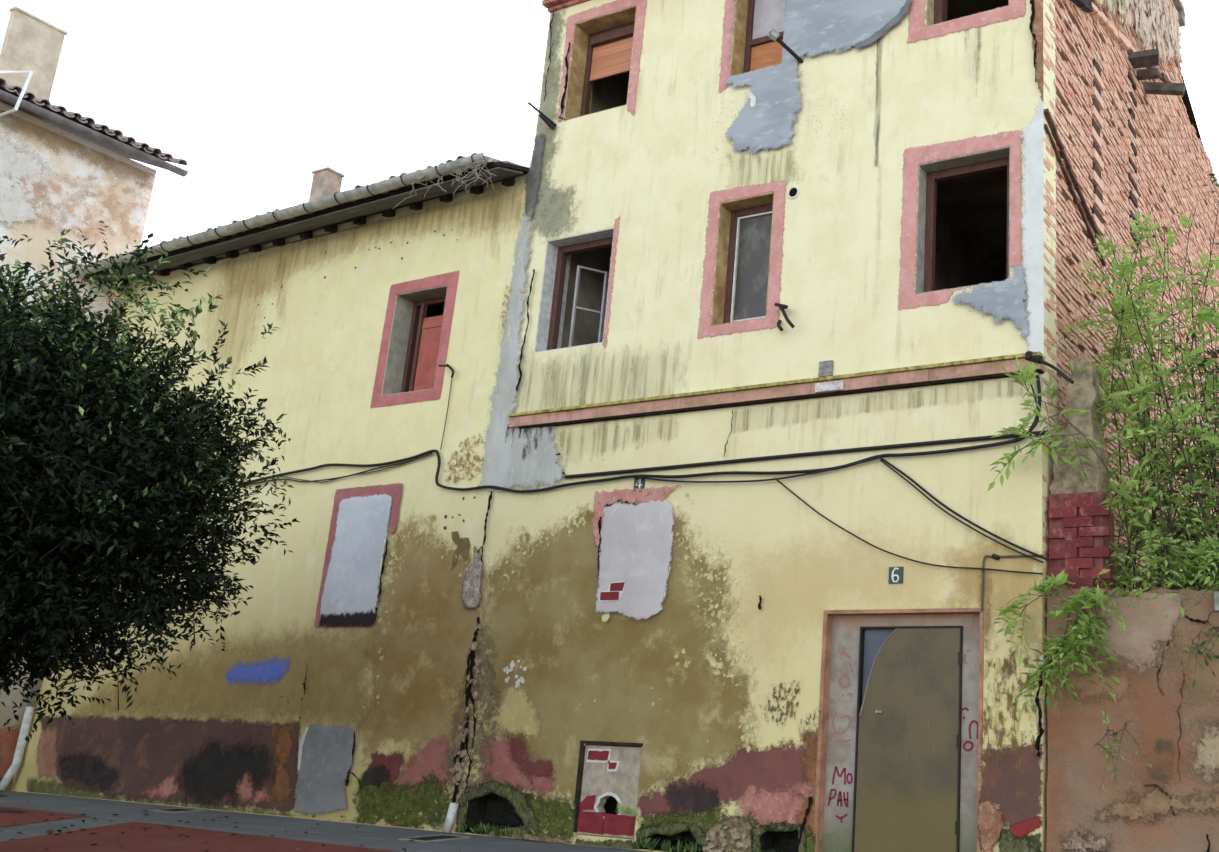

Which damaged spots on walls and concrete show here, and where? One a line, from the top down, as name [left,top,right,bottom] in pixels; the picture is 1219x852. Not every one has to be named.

peeling [0,129,151,241]
damp [78,505,758,816]
crack [452,617,480,803]
peeling [314,483,821,852]
peeling [977,643,1045,852]
spalling [1059,664,1136,706]
spalling [1058,787,1219,852]
crack [1135,586,1218,816]